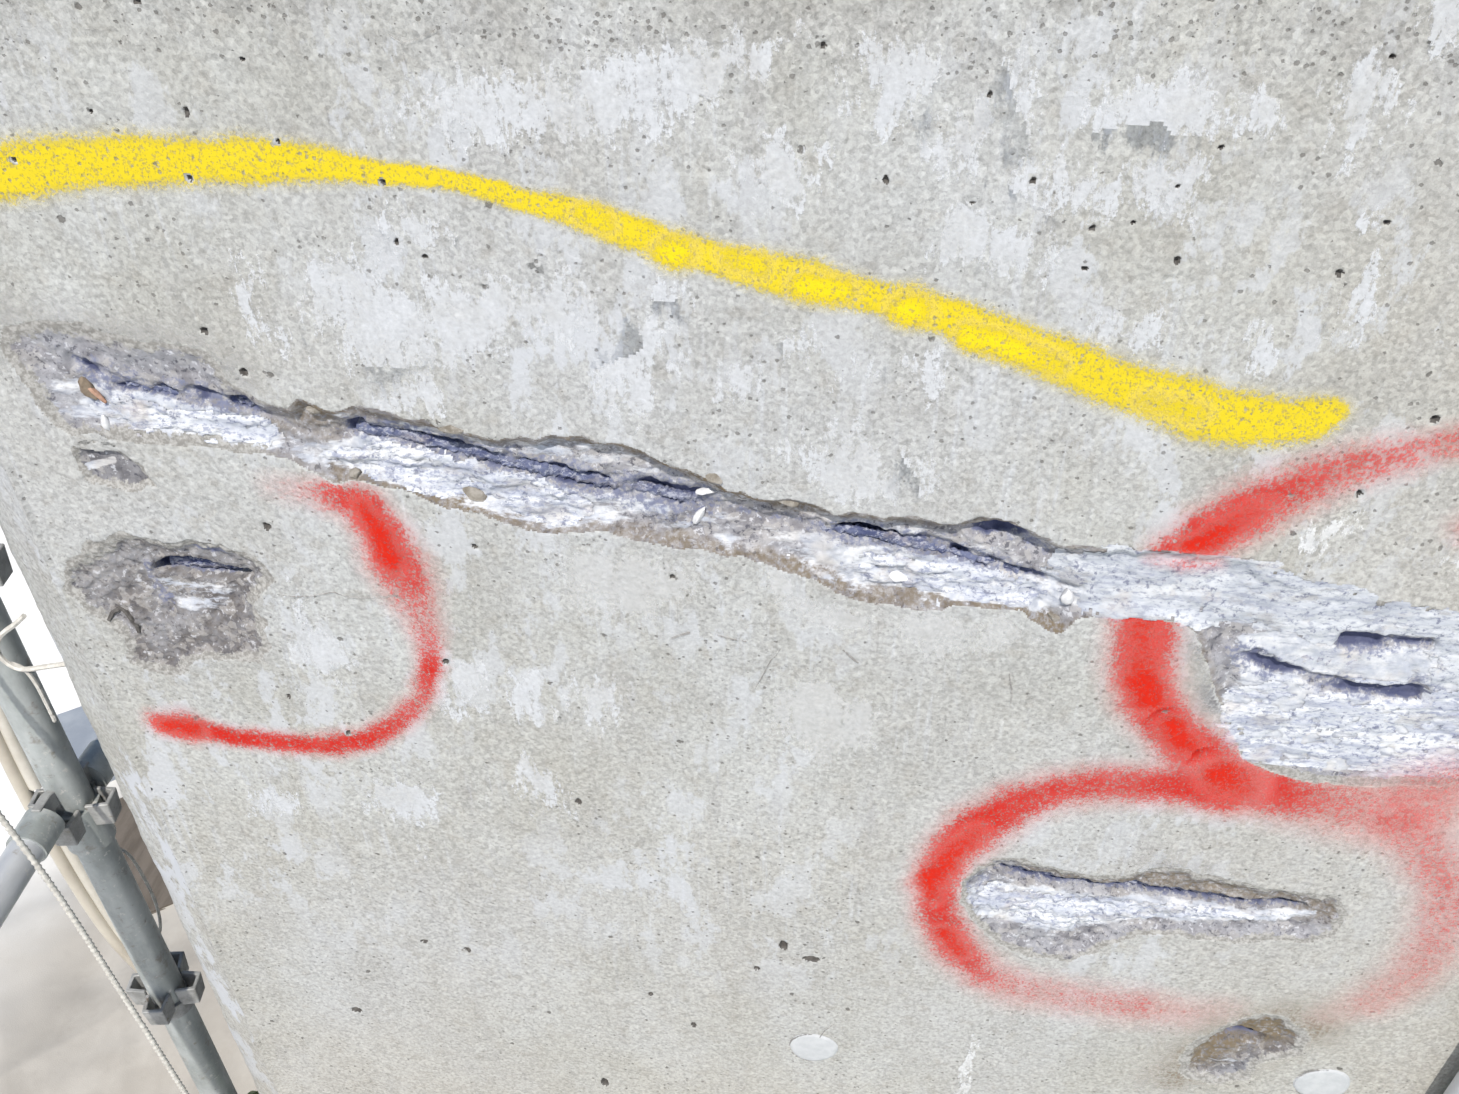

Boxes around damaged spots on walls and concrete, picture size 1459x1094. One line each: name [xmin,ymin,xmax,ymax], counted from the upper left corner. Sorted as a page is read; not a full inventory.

peeling [752,125,835,220]
spalling [0,198,1459,795]
peeling [247,786,300,818]
peeling [361,777,441,828]
peeling [512,751,579,820]
spalling [947,850,1357,967]
spalling [1168,1011,1323,1089]